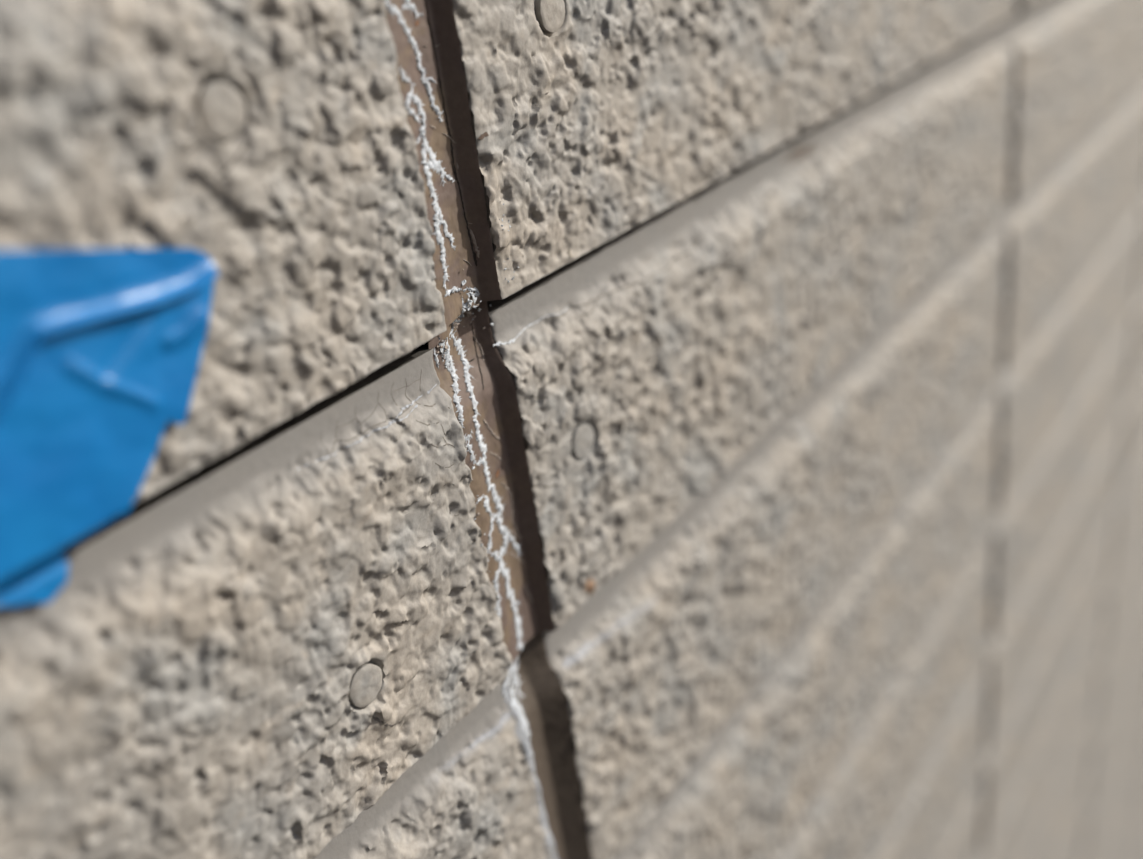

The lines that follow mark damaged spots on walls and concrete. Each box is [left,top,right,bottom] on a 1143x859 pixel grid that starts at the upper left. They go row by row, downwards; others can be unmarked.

peeling [436,223,494,362]
crack [296,0,707,666]
crack [367,714,395,727]
peeling [502,660,532,743]